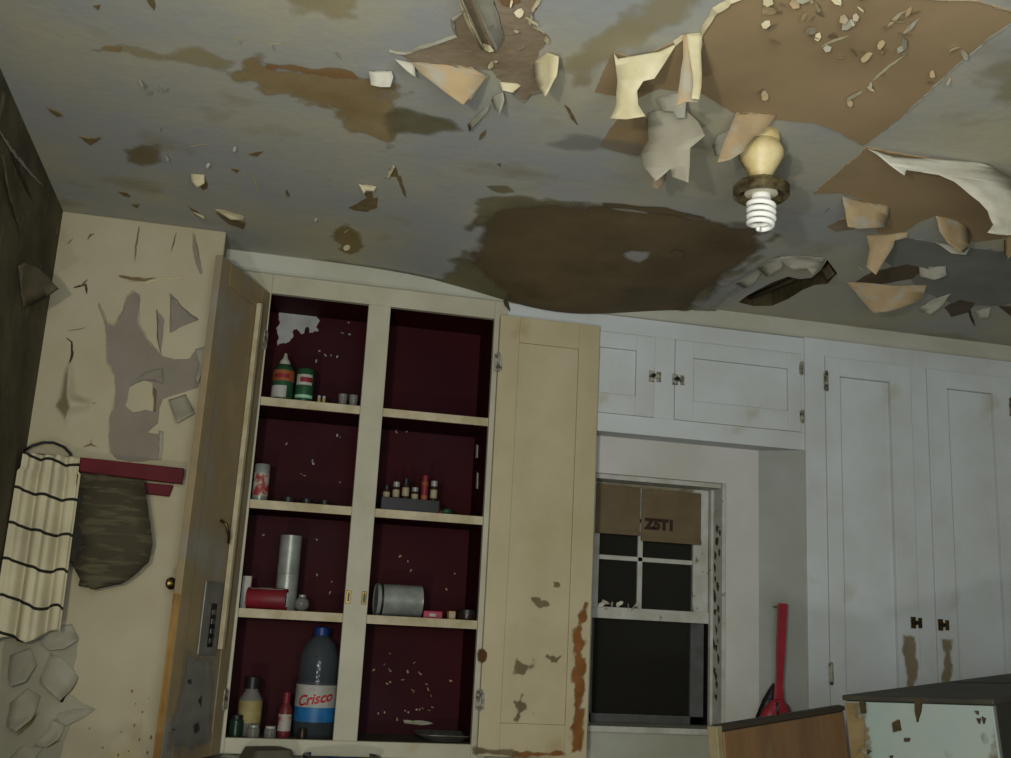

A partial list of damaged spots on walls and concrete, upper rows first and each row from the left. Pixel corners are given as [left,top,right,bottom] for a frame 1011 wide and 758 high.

water stain [97,46,457,142]
peeling [369,0,559,140]
water stain [128,146,158,165]
peeling [138,163,210,190]
peeling [215,209,246,229]
peeling [349,184,378,212]
peeling [386,165,406,197]
water stain [439,186,779,314]
peeling [595,0,1011,326]
peeling [98,290,204,462]
peeling [0,624,96,758]